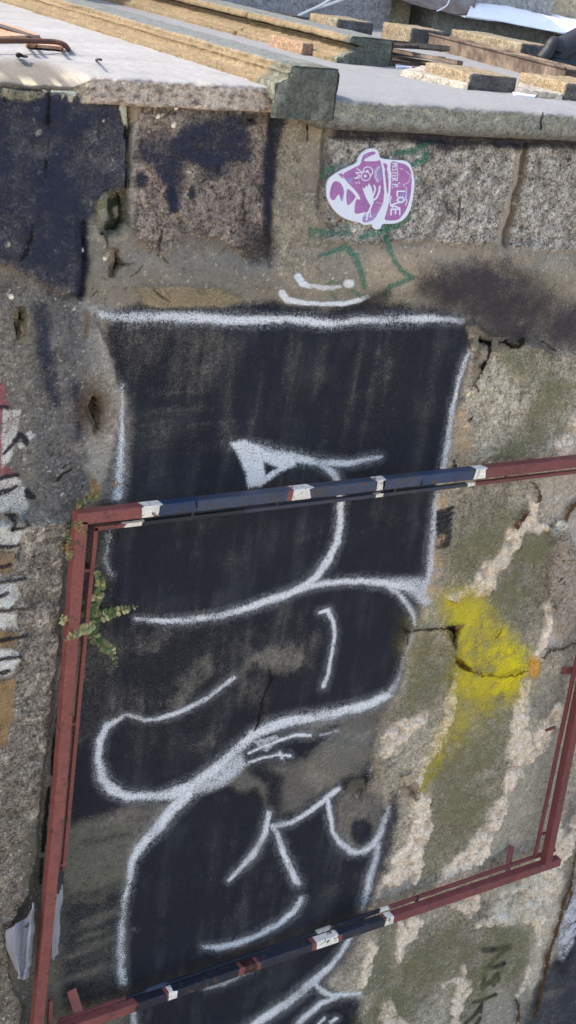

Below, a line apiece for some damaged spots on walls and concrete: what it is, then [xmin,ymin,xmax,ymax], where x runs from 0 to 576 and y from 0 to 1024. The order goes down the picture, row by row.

spalling [95,187,129,277]
spalling [87,392,106,435]
crack [453,336,556,429]
crack [402,626,576,678]
crack [254,667,273,732]